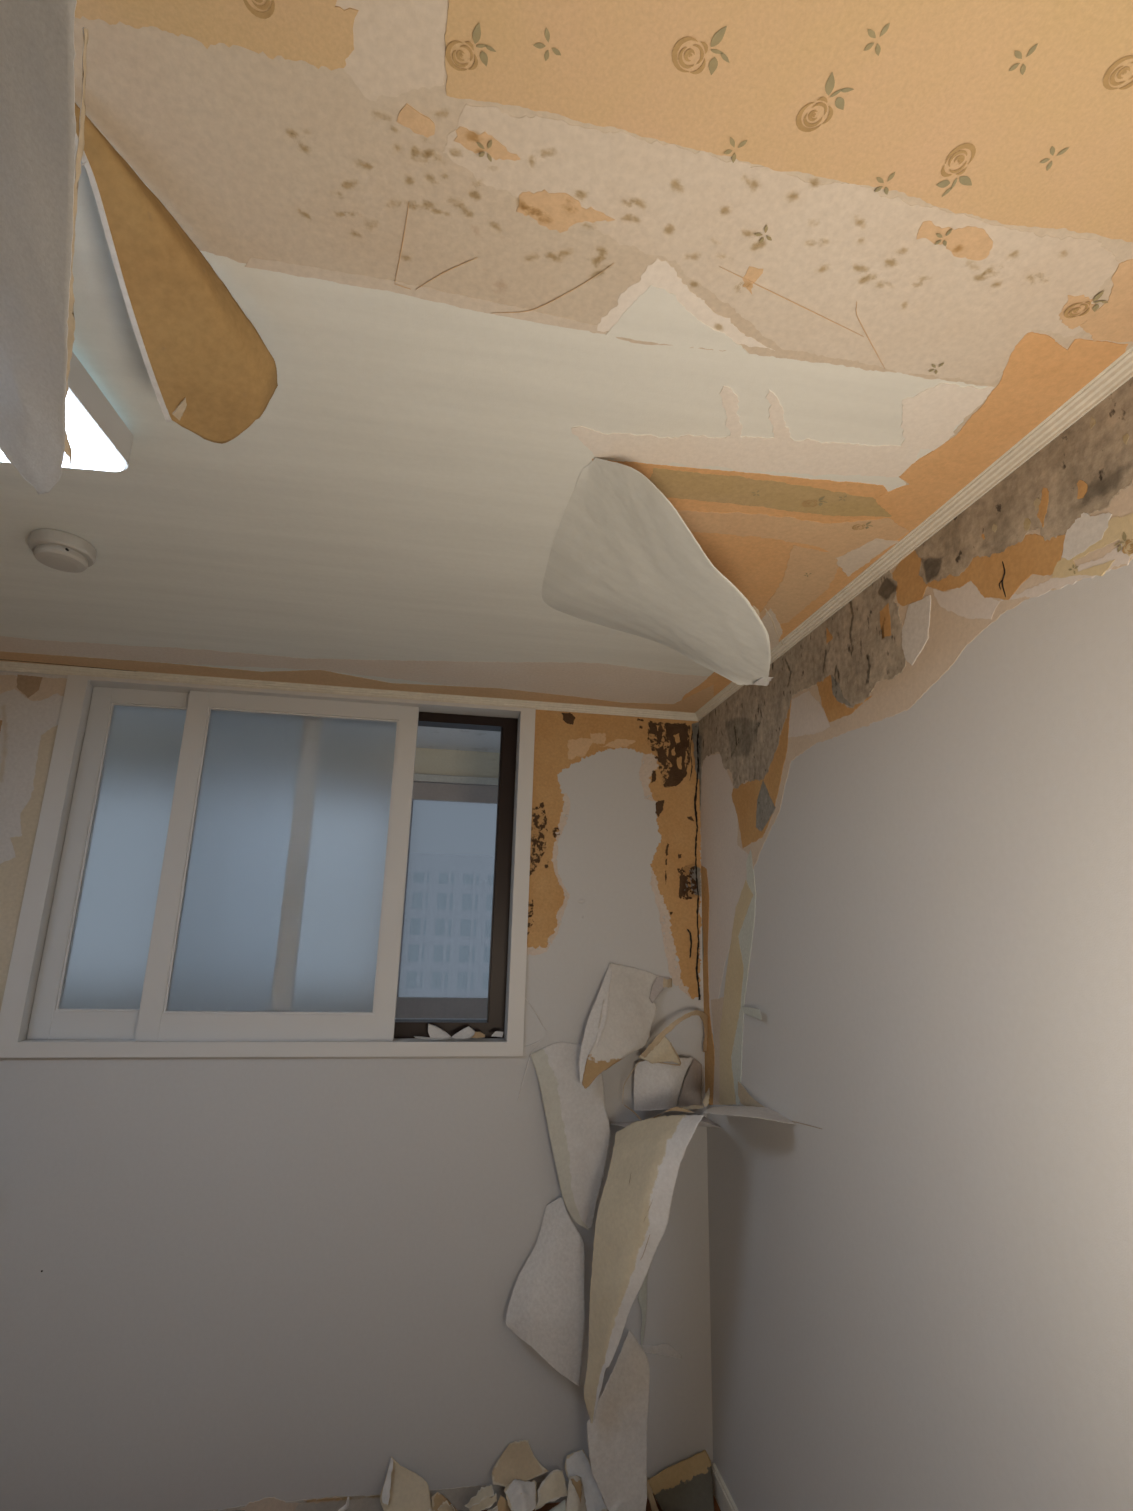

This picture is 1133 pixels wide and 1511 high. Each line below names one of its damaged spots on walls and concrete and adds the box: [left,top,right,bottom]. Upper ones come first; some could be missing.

peeling [0,377,1133,832]
peeling [701,849,762,1105]
peeling [199,1495,384,1511]
peeling [429,1484,508,1511]
peeling [536,1481,569,1505]